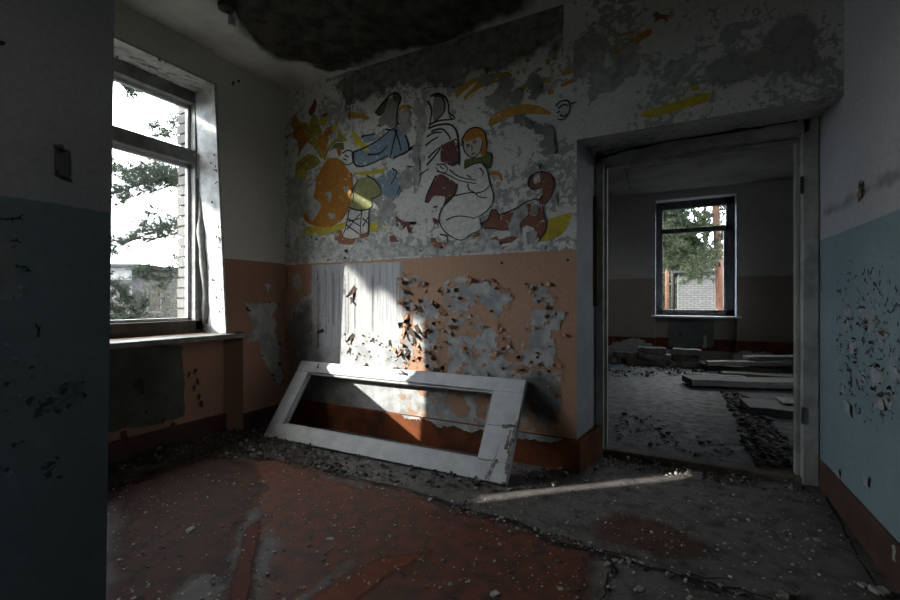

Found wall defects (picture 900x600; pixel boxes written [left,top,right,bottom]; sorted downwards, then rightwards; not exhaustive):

peeling [397,93,428,194]
peeling [245,283,284,385]
peeling [286,176,568,479]
peeling [835,260,900,431]